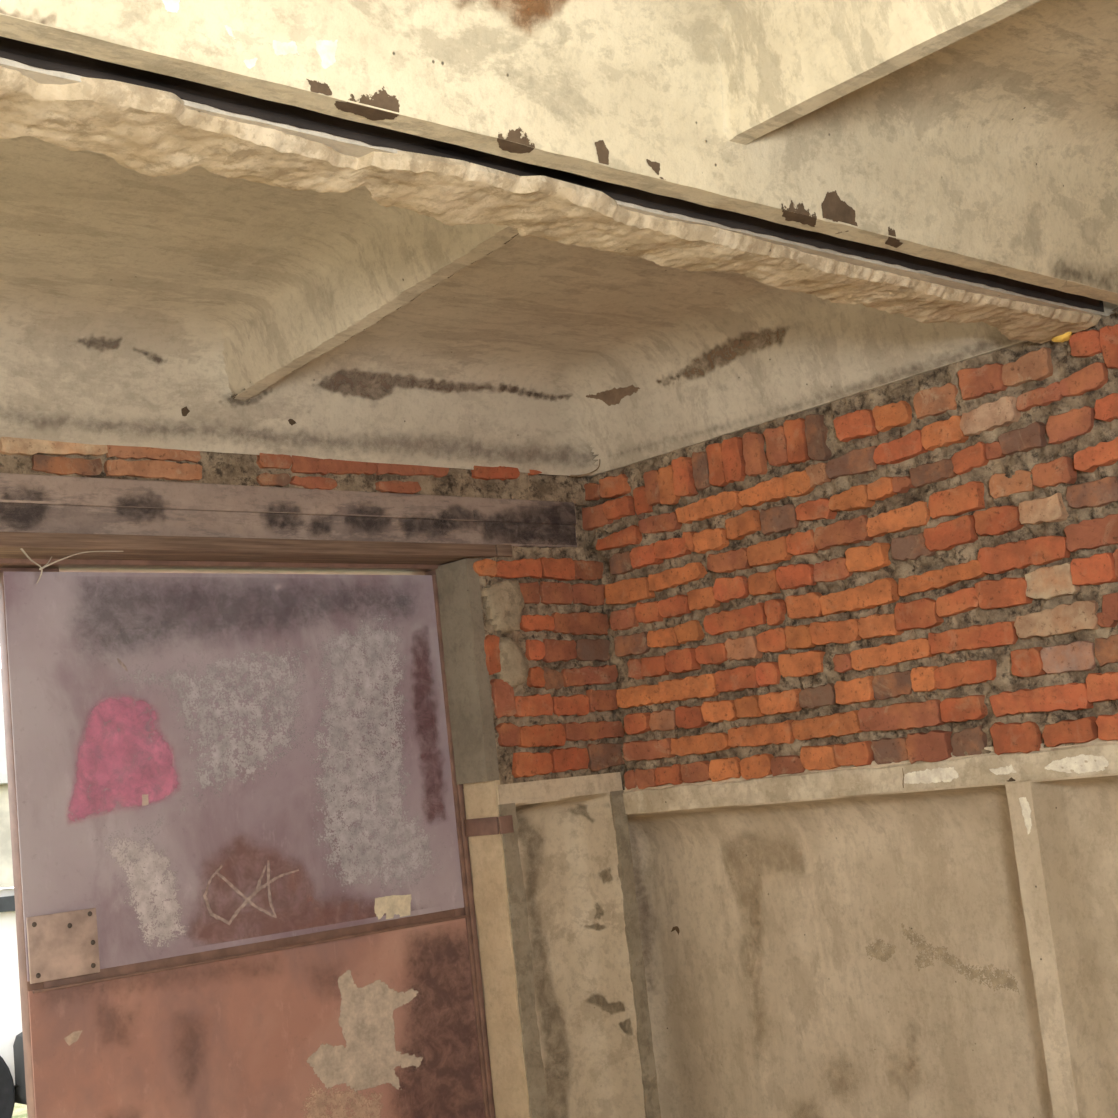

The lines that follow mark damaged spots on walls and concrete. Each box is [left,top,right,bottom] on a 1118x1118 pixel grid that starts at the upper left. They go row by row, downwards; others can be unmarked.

peeling [162,0,181,13]
rust [493,0,566,28]
spalling [307,39,400,121]
spalling [497,127,535,154]
spalling [595,140,609,165]
spalling [646,159,664,180]
spalling [781,190,857,234]
spalling [885,226,903,248]
damp [657,329,785,383]
damp [320,370,570,399]
peeling [989,764,1017,775]